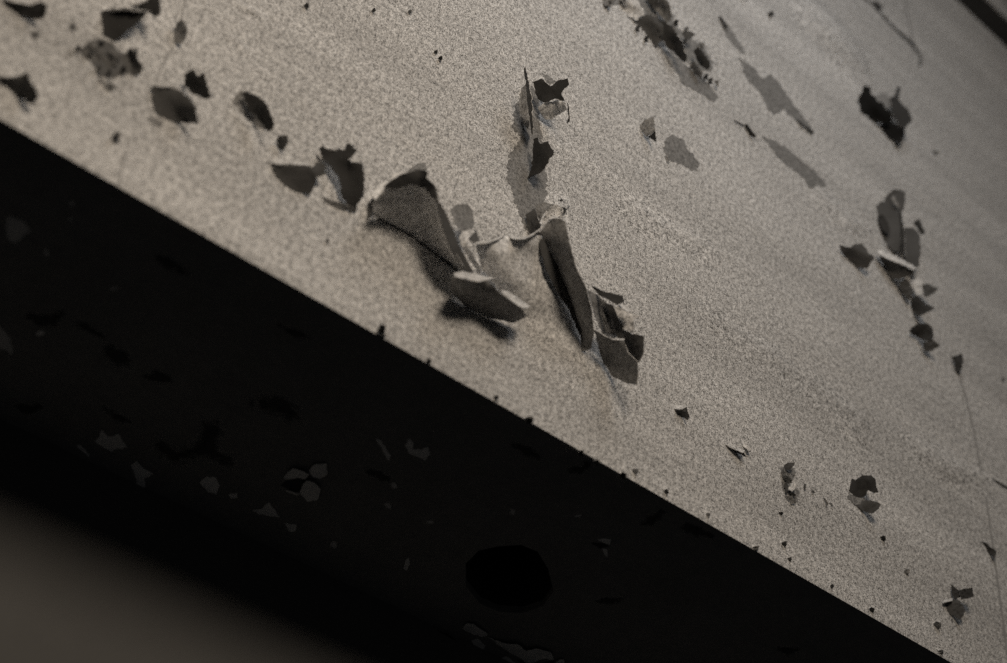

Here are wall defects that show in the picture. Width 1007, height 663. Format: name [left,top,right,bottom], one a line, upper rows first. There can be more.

peeling [6,0,47,20]
peeling [76,0,161,91]
peeling [603,0,720,102]
crack [866,0,922,66]
peeling [0,69,39,105]
peeling [148,69,212,127]
peeling [857,84,912,143]
peeling [233,67,644,385]
peeling [838,189,940,352]
peeling [779,463,833,515]
peeling [847,475,881,513]
crack [957,371,1007,657]